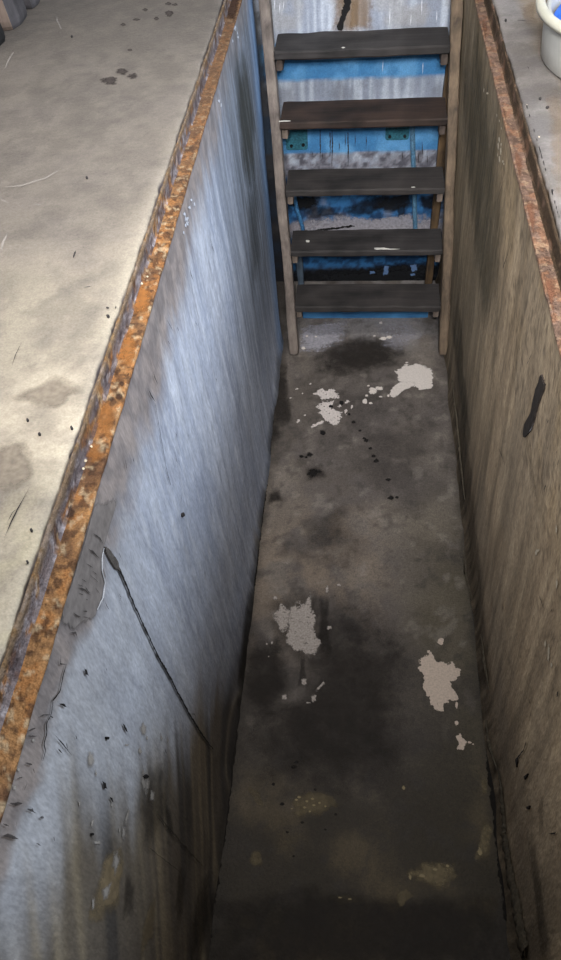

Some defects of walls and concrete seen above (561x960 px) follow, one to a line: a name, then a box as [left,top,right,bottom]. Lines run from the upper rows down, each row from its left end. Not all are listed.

corrosion [227,0,239,19]
corrosion [134,276,150,312]
corrosion [97,333,136,433]
leakage [300,323,397,372]
peeling [290,362,433,435]
corrosion [82,444,102,470]
crack [254,405,276,591]
peeling [62,499,116,629]
peeling [273,592,331,655]
peeling [418,638,461,711]
crack [104,546,249,952]